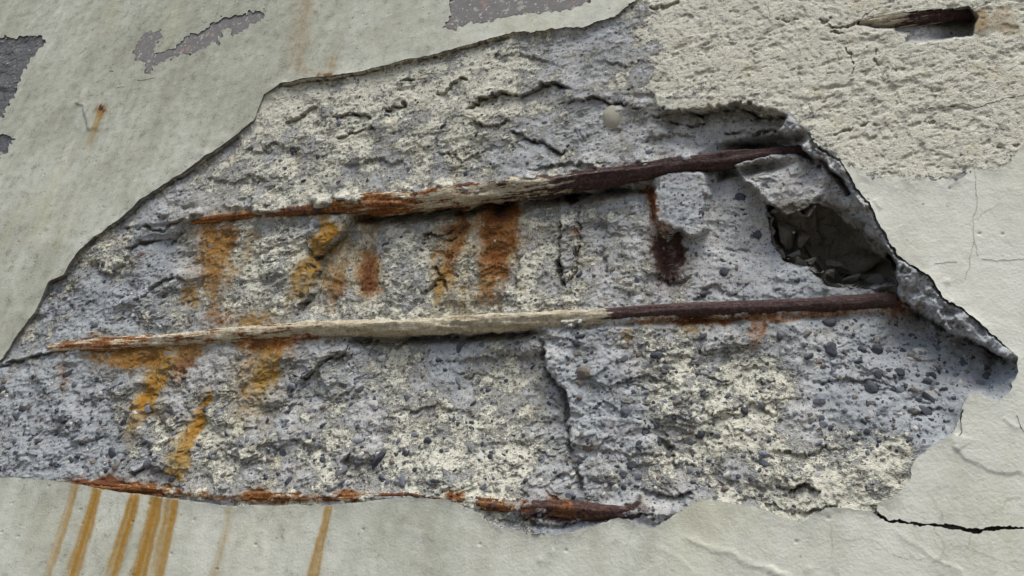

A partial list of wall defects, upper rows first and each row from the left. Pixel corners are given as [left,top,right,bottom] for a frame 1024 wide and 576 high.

peeling [0,35,46,118]
peeling [132,8,265,75]
peeling [443,0,591,31]
flaking render [639,0,1024,182]
spalling [167,114,257,183]
spalling [0,183,167,362]
rust [181,223,327,394]
rust [432,201,520,299]
rust [641,186,689,286]
rust [86,343,201,428]
rust [50,391,332,576]
crack [877,513,1024,534]